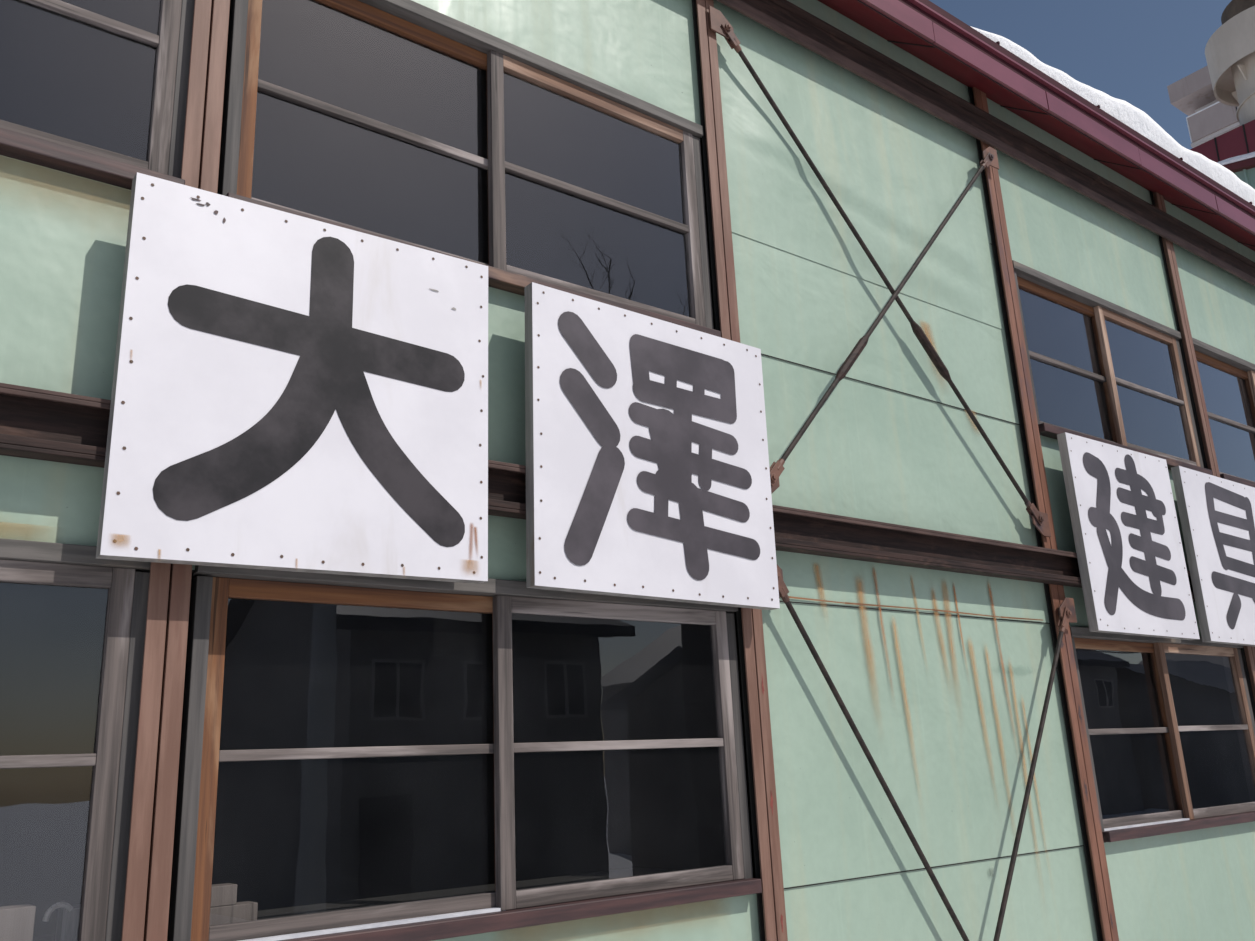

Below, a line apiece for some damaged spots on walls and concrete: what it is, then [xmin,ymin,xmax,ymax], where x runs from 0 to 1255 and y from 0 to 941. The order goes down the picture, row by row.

corrosion [858,570,909,716]
corrosion [933,585,1036,785]